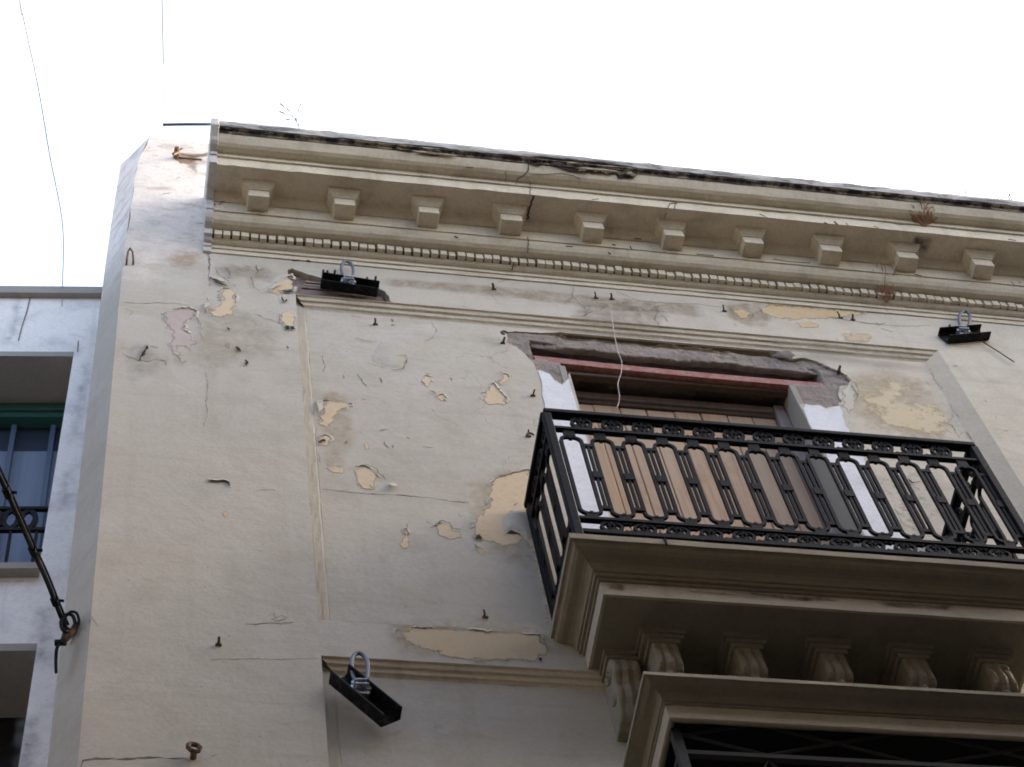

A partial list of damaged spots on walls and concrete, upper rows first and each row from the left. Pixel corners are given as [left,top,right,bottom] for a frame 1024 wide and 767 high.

crack [489,163,596,300]
peeling [161,266,239,363]
spalling [250,273,384,330]
peeling [722,303,867,328]
peeling [479,371,512,406]
spalling [507,332,953,434]
peeling [315,398,397,489]
peeling [430,468,539,569]
peeling [391,625,549,664]